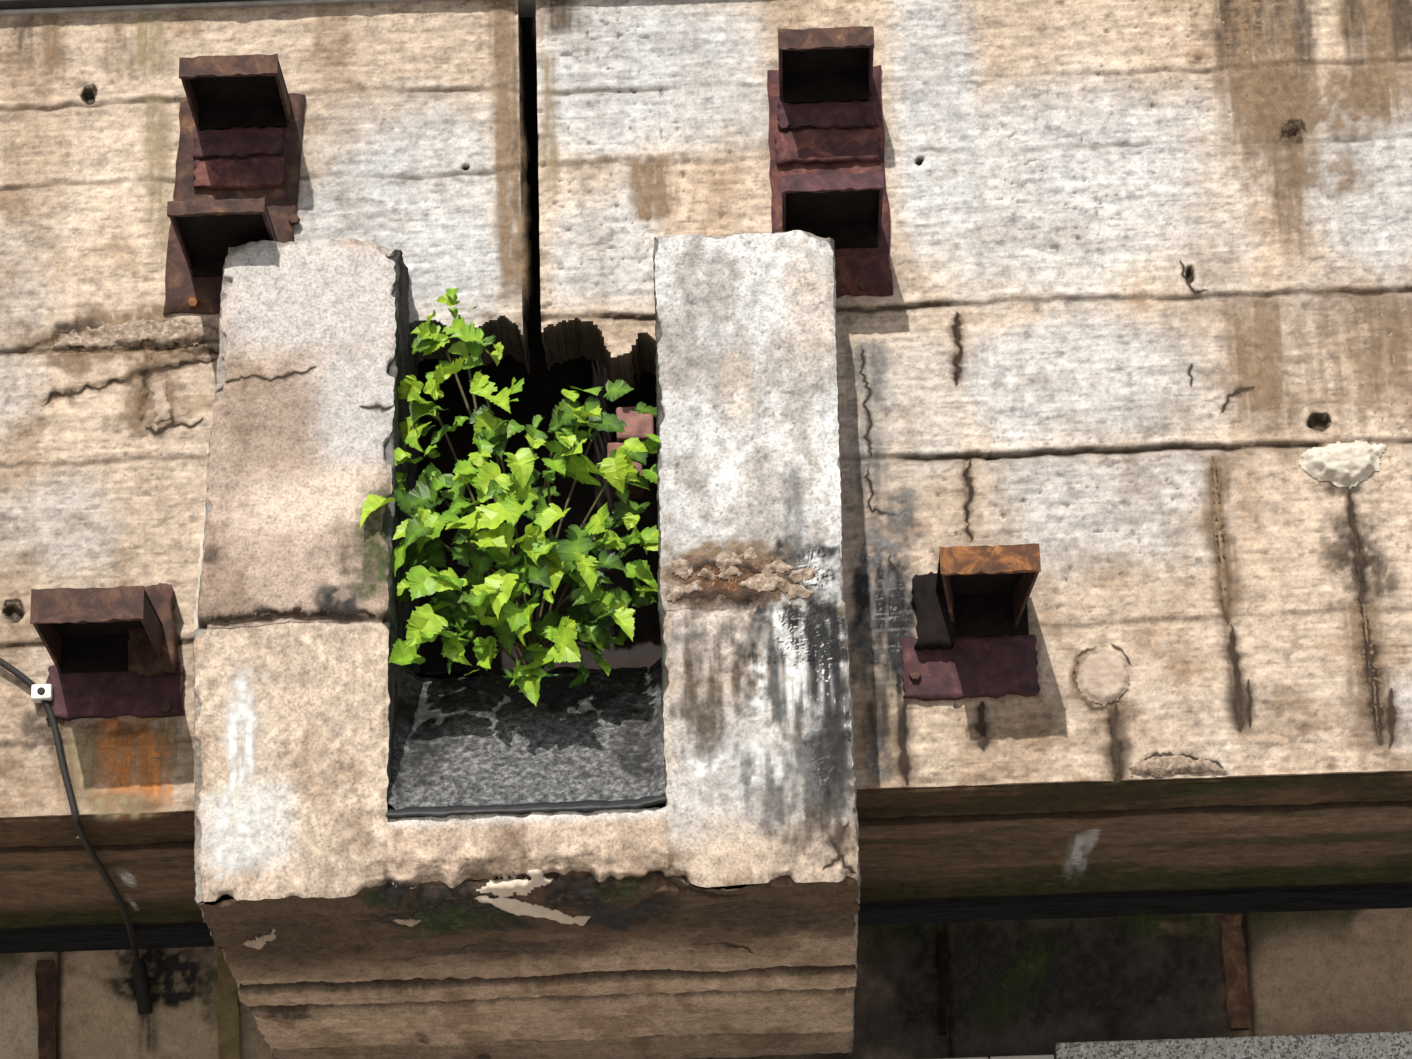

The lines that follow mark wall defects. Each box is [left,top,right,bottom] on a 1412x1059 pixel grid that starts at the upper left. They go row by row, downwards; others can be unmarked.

water stain [1216,0,1412,240]
crack [24,332,316,435]
crack [951,312,963,385]
crack [962,460,974,542]
spalling [663,541,818,610]
crack [1204,456,1252,732]
crack [1347,489,1397,747]
water stain [810,622,847,796]
rust [68,719,177,817]
spalling [243,923,325,964]
spalling [366,869,836,962]
spalling [263,1004,309,1020]